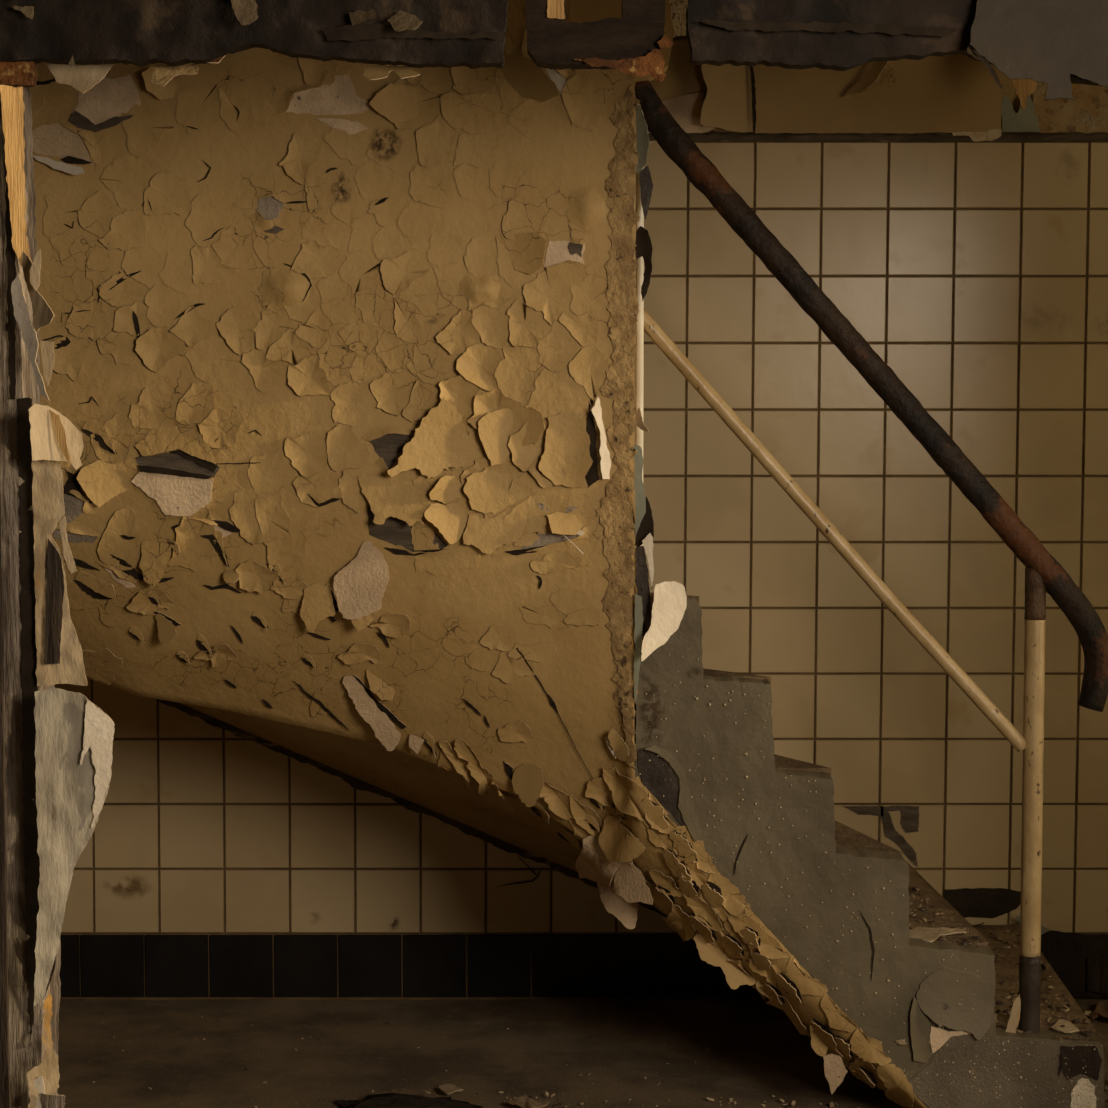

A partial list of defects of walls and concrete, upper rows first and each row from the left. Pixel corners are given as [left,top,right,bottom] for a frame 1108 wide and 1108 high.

peeling [662,91,718,133]
peeling [639,166,653,220]
peeling [11,0,644,769]
peeling [642,533,654,590]
peeling [437,738,515,814]
peeling [26,688,115,1108]
peeling [539,745,1105,1108]